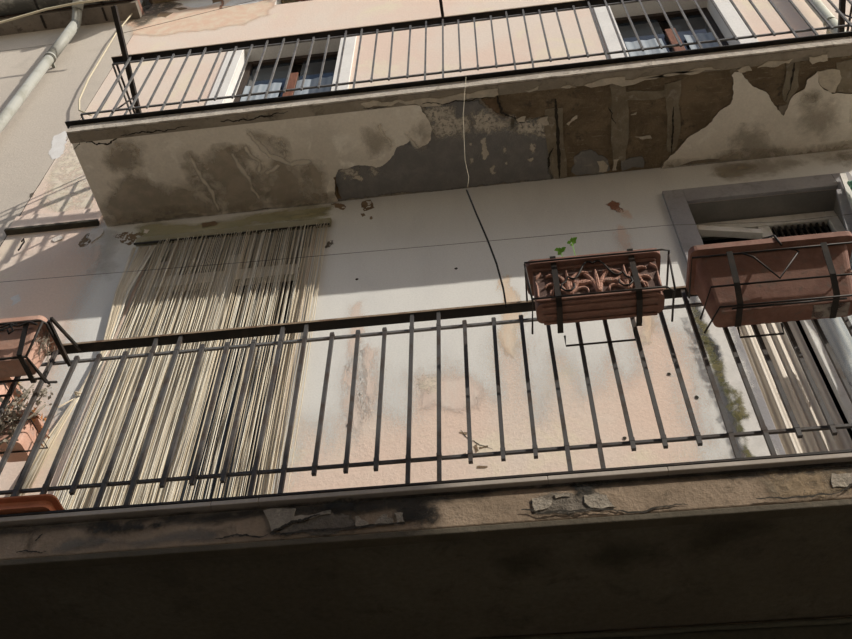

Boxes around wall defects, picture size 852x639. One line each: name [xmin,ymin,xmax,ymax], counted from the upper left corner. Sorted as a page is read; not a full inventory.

crack [74,126,188,149]
crack [221,111,288,122]
peeling [35,131,96,212]
leakage [107,133,330,237]
peeling [48,54,852,344]
corrosion [607,201,633,251]
peeling [15,351,107,469]
peeling [271,296,778,494]
spalling [263,508,405,535]
spalling [531,490,614,516]
spalling [763,471,852,499]